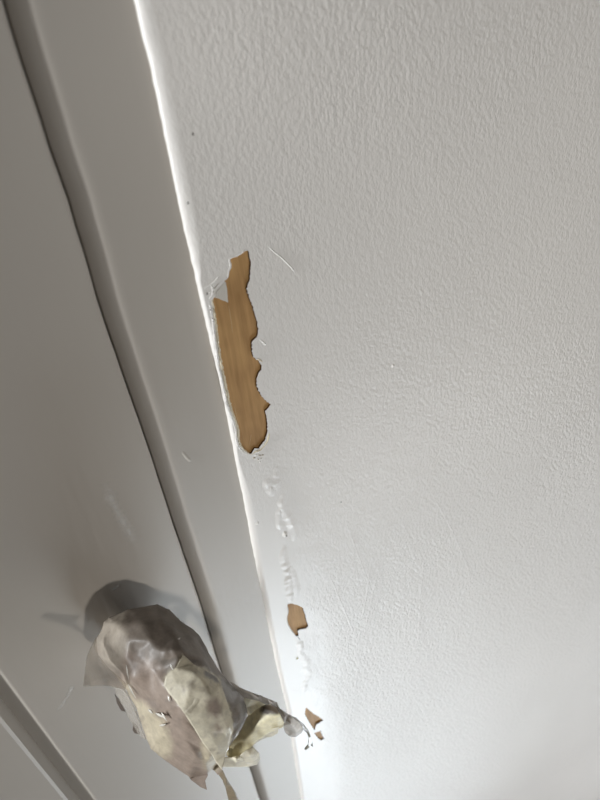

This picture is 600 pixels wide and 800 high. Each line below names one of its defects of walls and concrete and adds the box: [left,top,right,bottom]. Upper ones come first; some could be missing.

peeling [204,249,270,463]
peeling [286,603,308,638]
peeling [305,708,323,739]